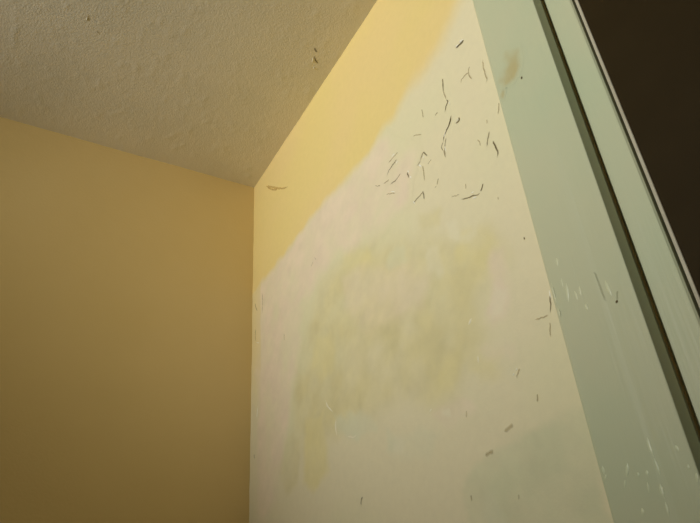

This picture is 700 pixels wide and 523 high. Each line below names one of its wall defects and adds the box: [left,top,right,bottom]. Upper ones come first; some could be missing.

crack [419,79,460,183]